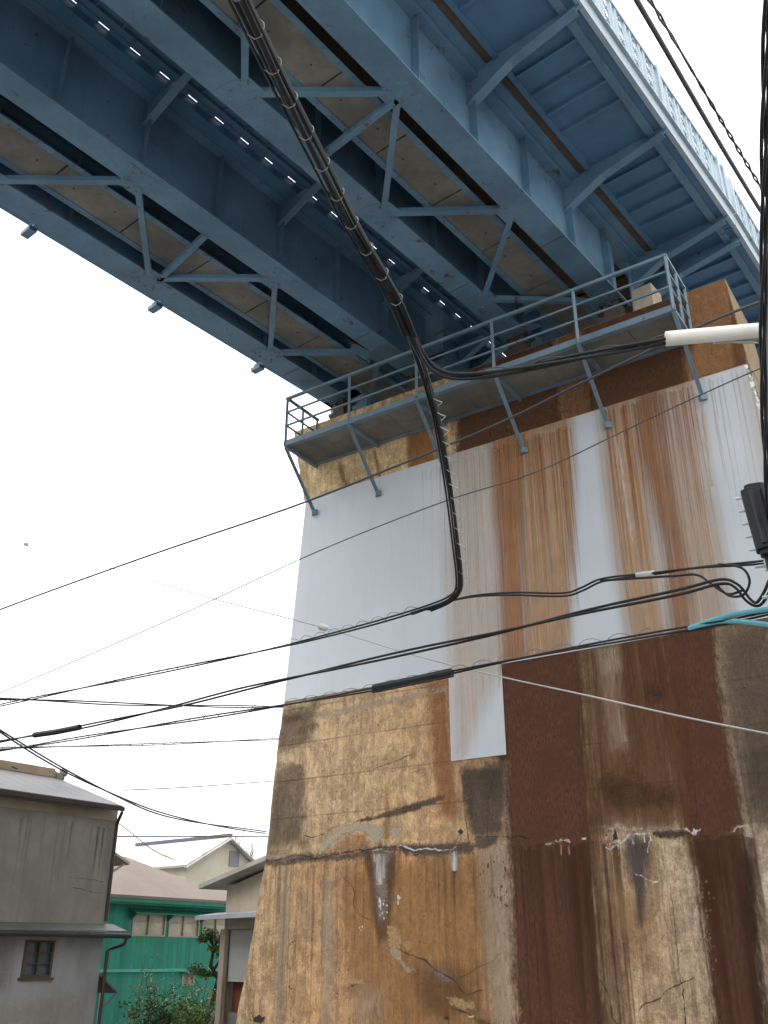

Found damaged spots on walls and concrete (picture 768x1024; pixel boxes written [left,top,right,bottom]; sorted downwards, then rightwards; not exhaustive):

rust [465,280,737,372]
rust [409,342,768,1024]
leakage [318,822,457,940]
leakage [458,760,509,1024]
leakage [605,832,659,924]
crack [639,887,693,1024]